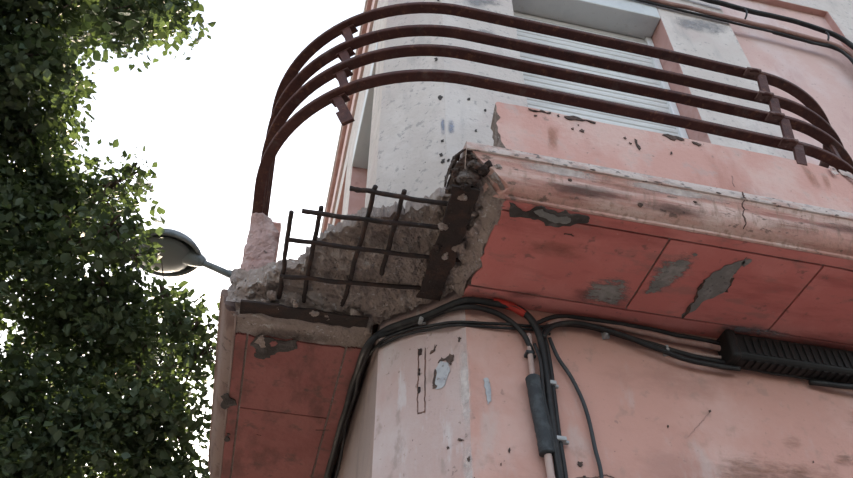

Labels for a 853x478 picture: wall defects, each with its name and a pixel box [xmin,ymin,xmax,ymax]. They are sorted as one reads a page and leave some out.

crack [732,176,747,229]
spalling [226,148,590,360]
peeling [645,253,698,294]
peeling [682,257,752,319]
peeling [430,345,454,389]